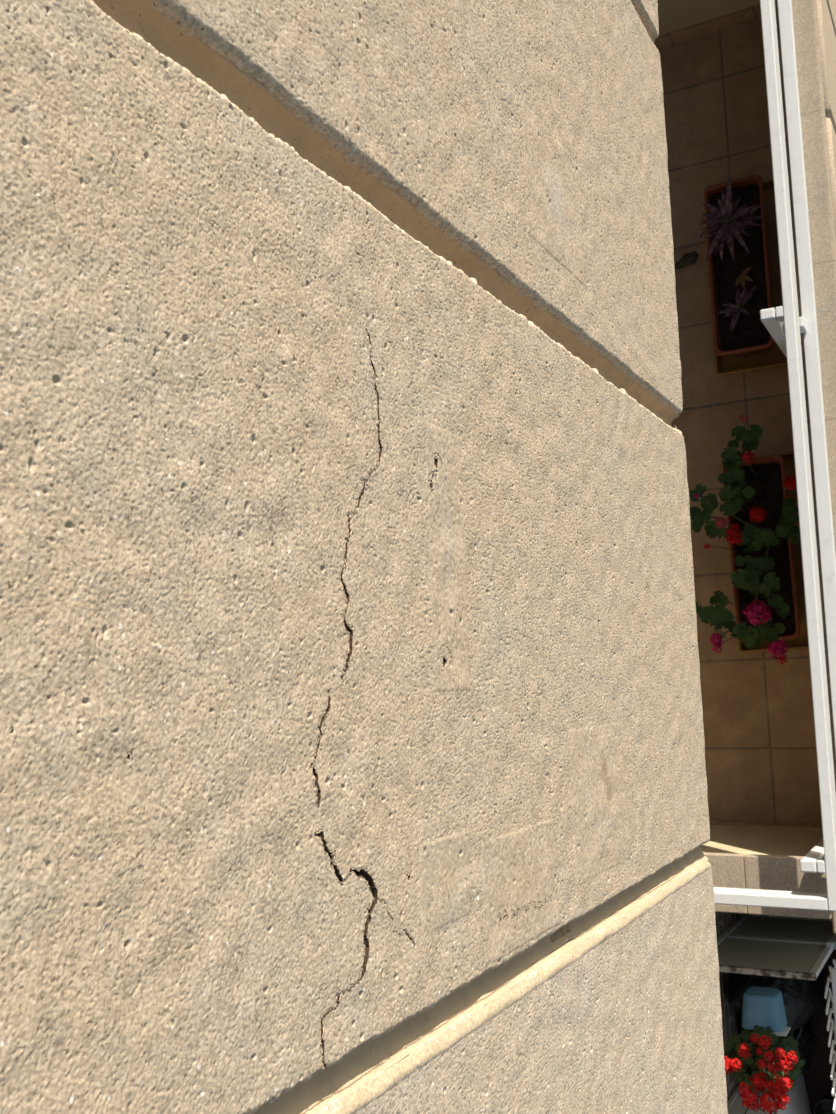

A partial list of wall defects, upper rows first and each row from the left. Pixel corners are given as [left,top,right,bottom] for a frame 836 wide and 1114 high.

crack [302,330,684,1114]